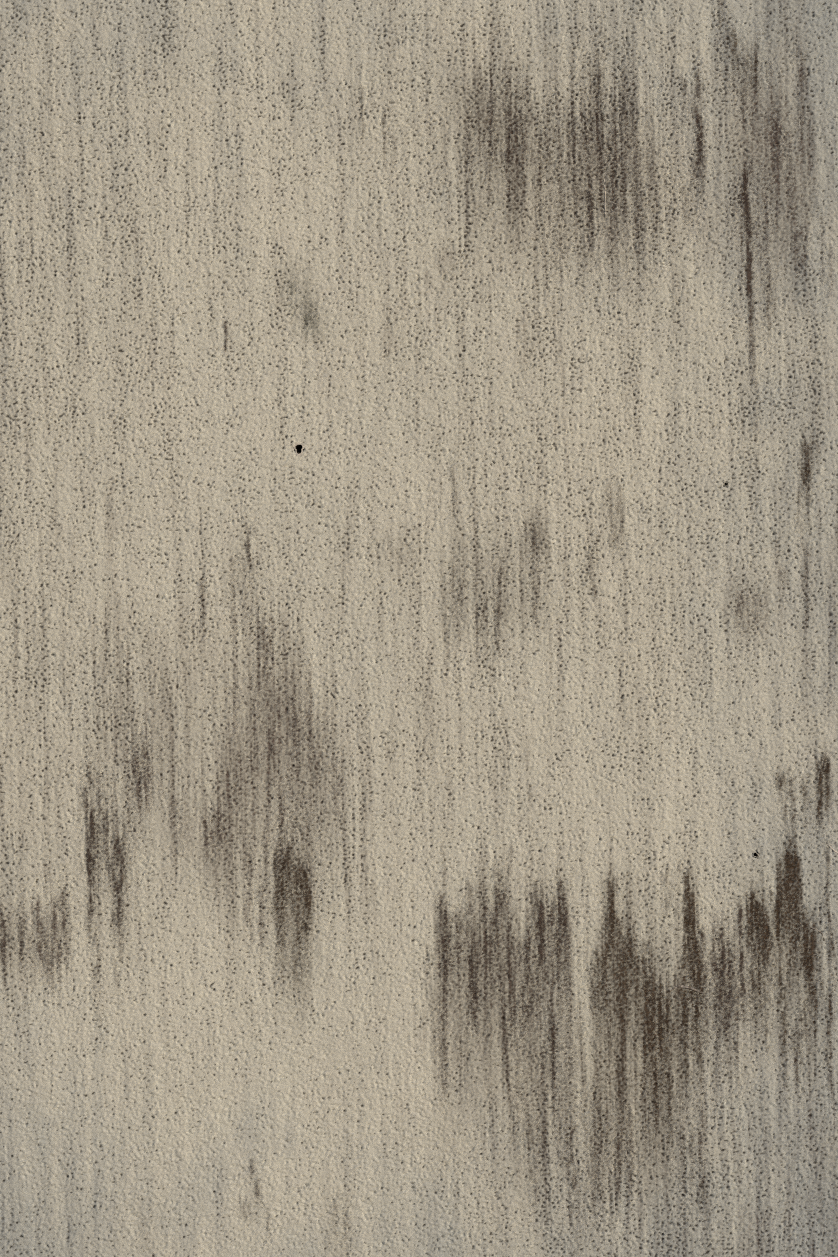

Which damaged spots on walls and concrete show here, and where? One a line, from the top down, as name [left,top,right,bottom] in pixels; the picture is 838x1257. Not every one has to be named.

leakage [475,79,546,210]
leakage [572,109,651,234]
leakage [741,54,813,325]
leakage [204,631,321,851]
leakage [785,759,830,819]
leakage [85,799,124,926]
leakage [274,847,312,954]
leakage [435,879,572,1123]
leakage [592,840,834,1150]